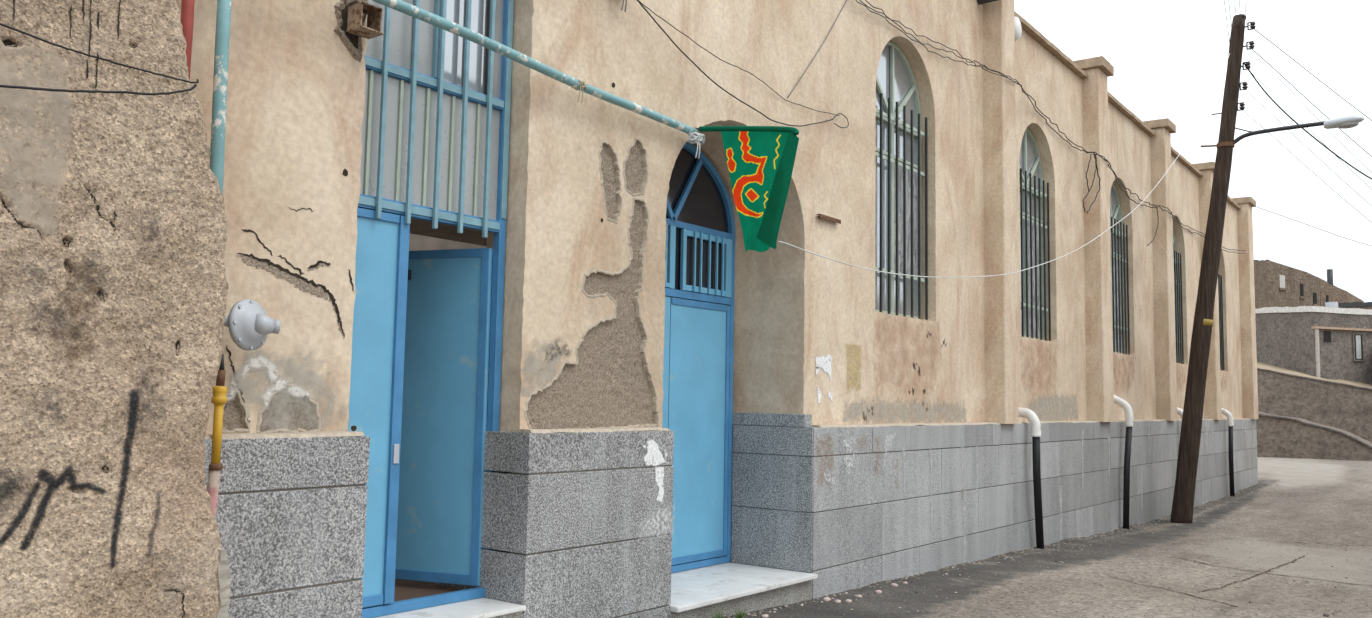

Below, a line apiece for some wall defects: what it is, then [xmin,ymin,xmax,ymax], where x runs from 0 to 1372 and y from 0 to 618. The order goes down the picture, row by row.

crack [237,229,354,338]
peeling [523,137,660,429]